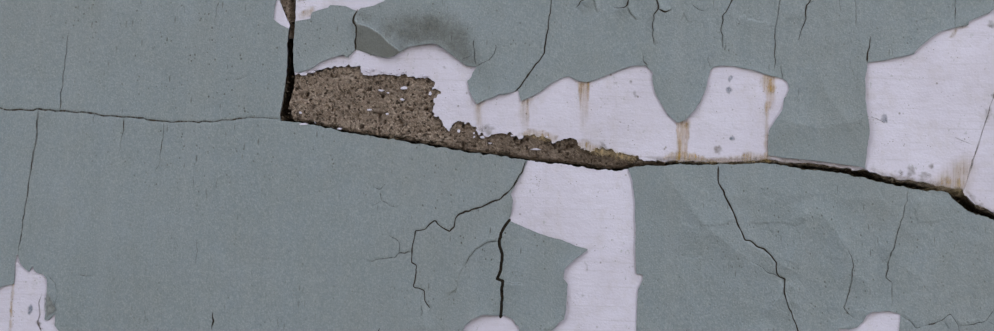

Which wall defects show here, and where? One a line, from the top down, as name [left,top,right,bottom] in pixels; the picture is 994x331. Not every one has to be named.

crack [351,9,359,51]
crack [515,0,552,92]
crack [614,0,733,65]
crack [774,0,813,73]
crack [0,20,637,318]
peeling [274,0,994,331]
crack [651,160,994,331]
peeling [0,255,58,331]